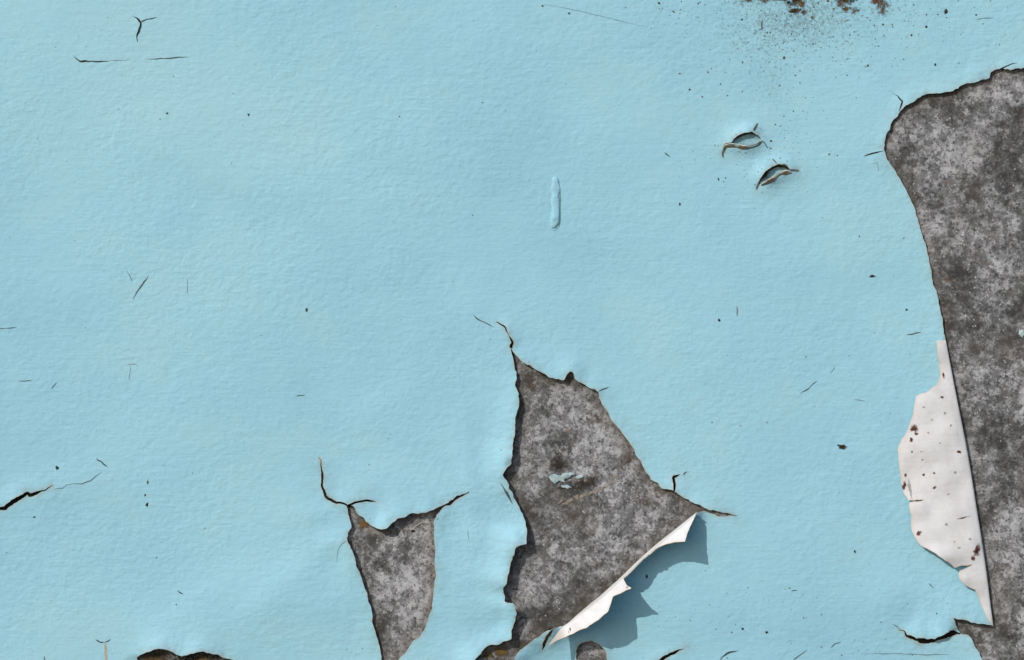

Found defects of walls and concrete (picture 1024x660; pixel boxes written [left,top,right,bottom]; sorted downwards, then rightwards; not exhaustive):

rust [746,0,806,14]
crack [74,17,183,62]
peeling [865,63,1024,660]
crack [0,459,106,510]
peeling [474,315,737,660]
peeling [319,458,469,660]
peeling [137,649,232,660]
crack [866,624,960,655]